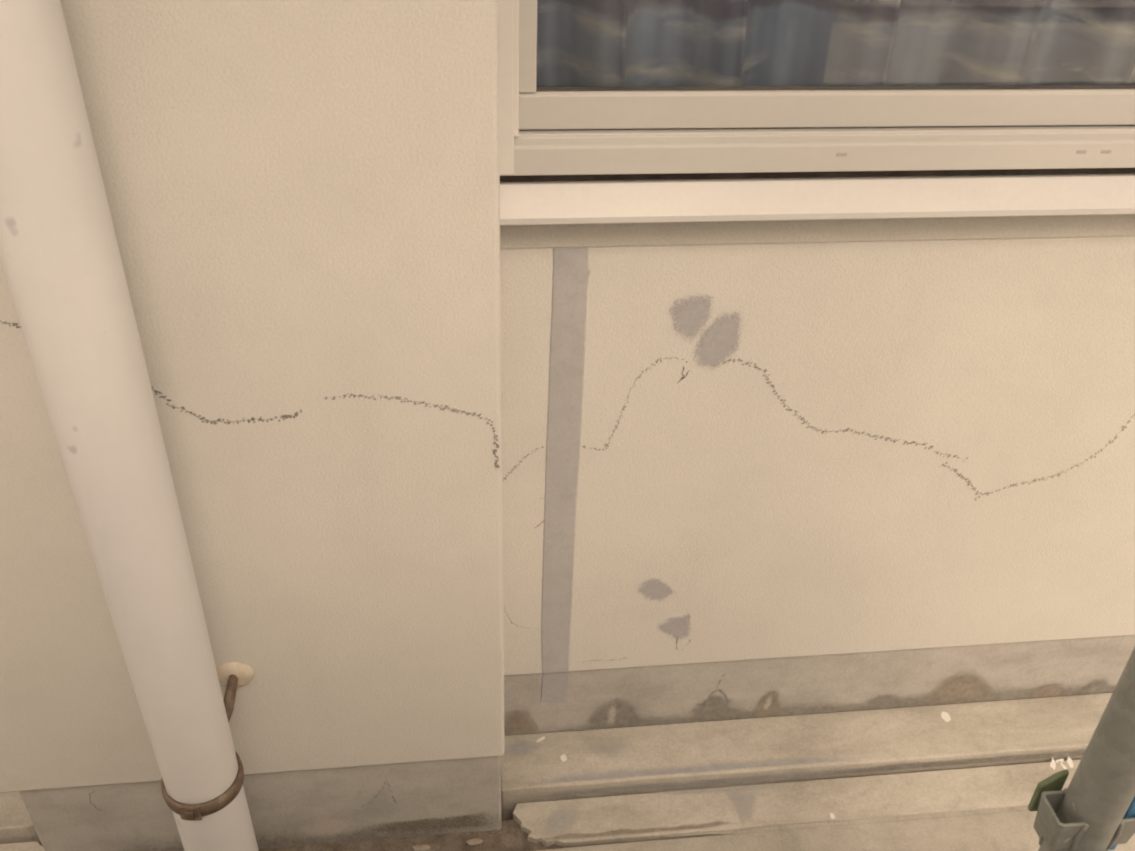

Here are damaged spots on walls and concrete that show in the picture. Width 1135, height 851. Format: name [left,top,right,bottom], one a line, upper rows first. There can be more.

crack [151,387,543,480]
crack [584,358,688,451]
crack [722,359,1134,501]